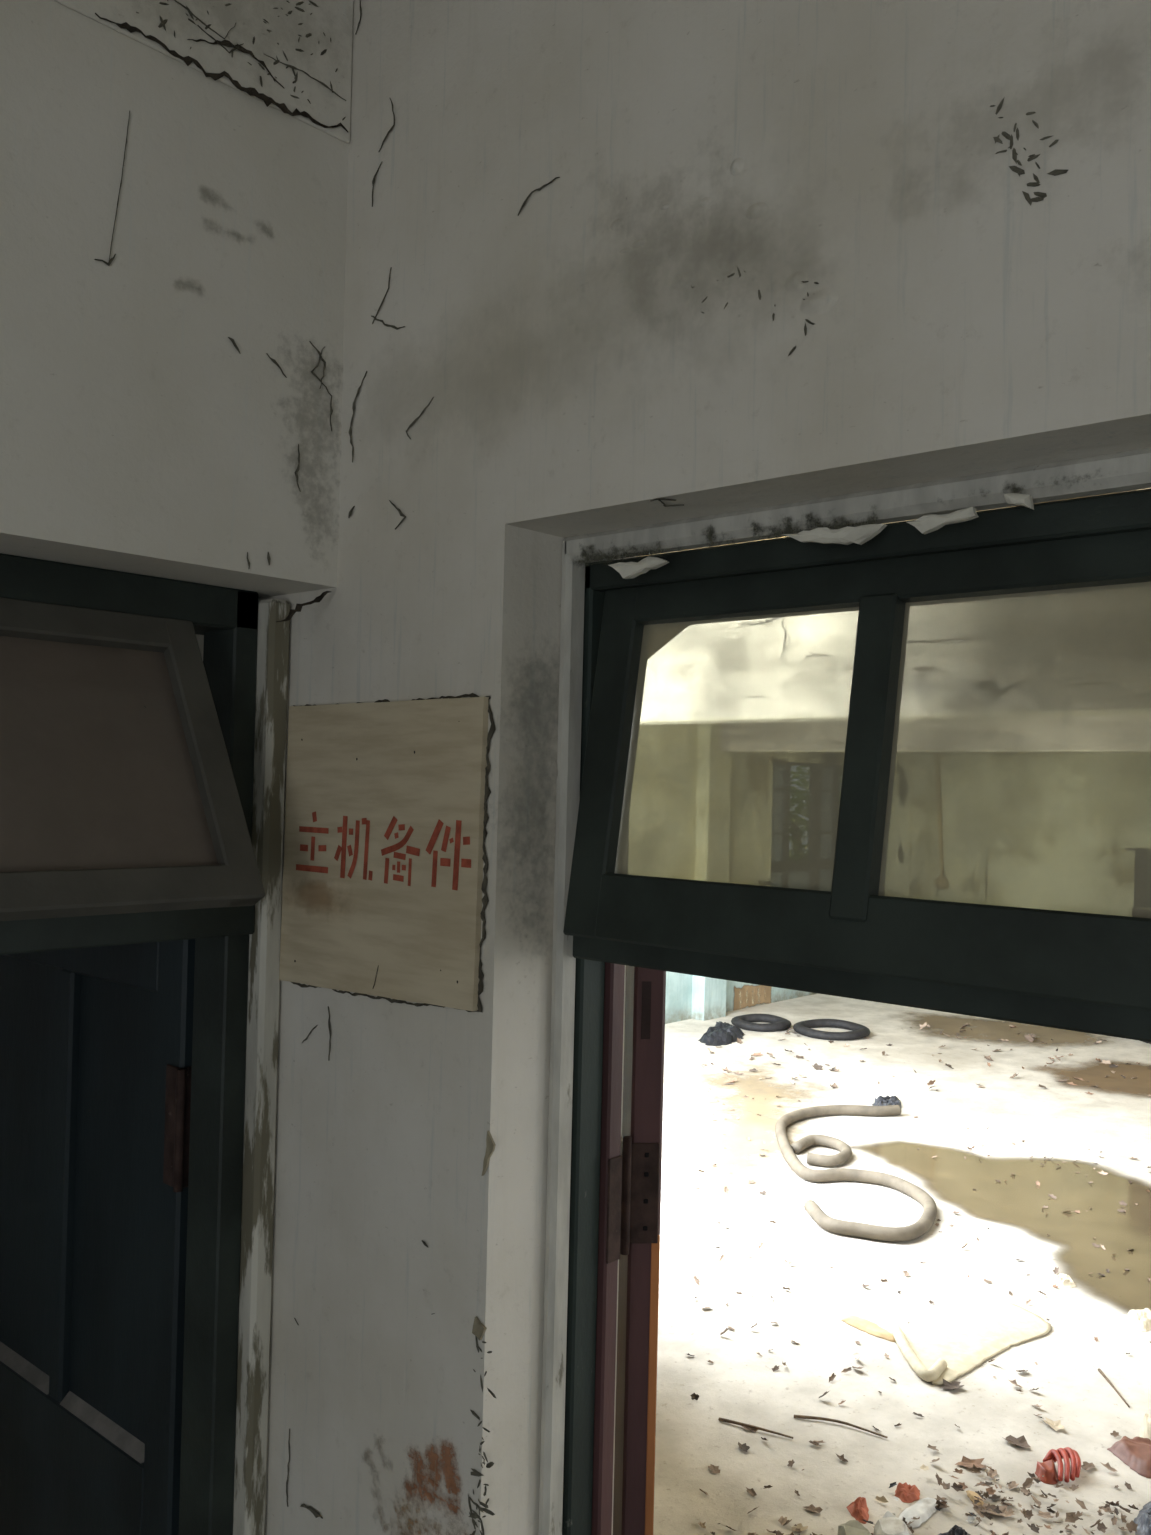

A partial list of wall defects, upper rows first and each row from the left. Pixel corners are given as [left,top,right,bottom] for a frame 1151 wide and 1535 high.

crack [95,13,348,132]
water stain [309,341,333,431]
peeling [1004,484,1034,510]
peeling [752,512,887,545]
peeling [907,507,979,534]
peeling [578,543,669,579]